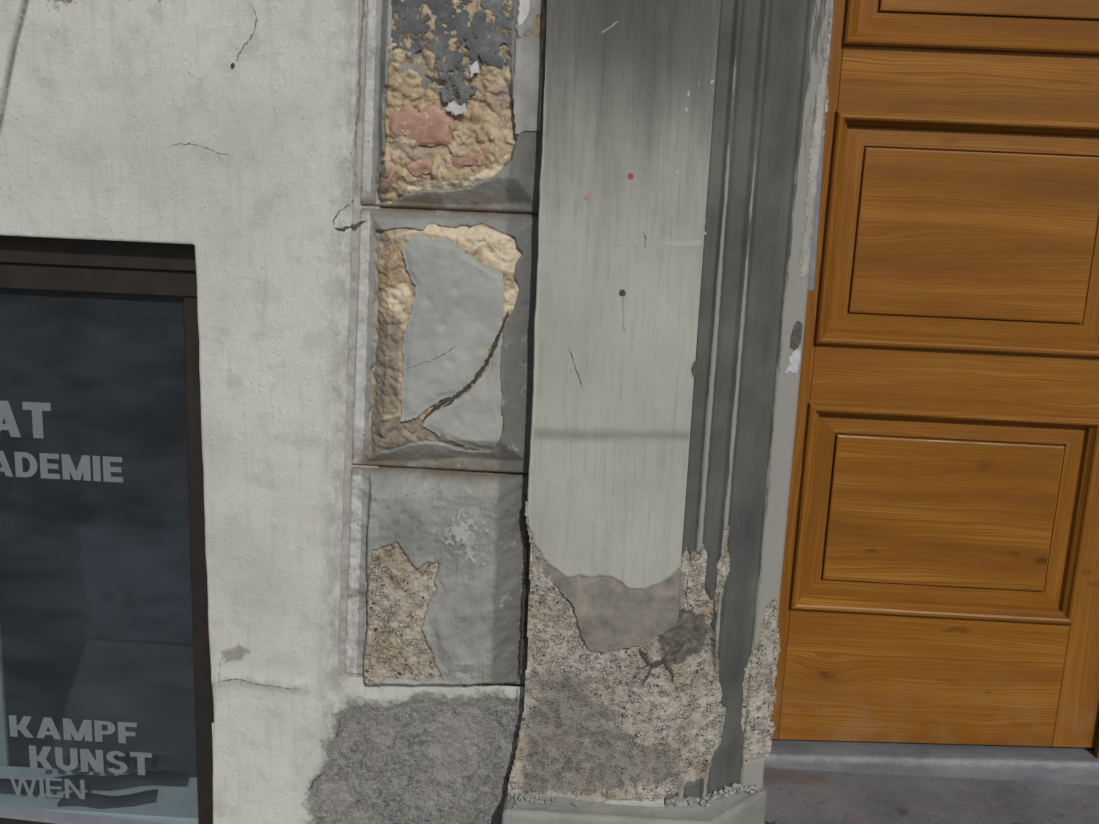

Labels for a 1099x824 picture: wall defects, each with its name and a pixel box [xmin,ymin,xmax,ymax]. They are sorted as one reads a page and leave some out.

crack [231,5,257,69]
flaking render [377,0,546,204]
flaking render [369,223,522,455]
crack [421,311,509,421]
flaking render [307,501,730,824]
flaking render [741,600,781,762]